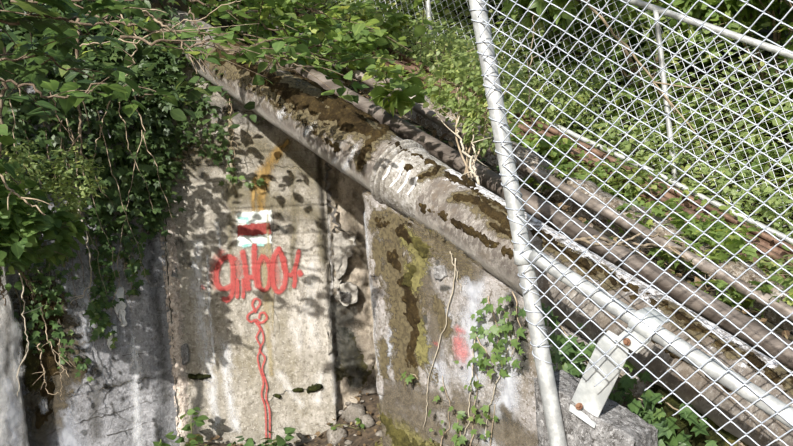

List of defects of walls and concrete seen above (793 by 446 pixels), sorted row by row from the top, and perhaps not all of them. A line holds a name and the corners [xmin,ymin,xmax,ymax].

corrosion [251,139,289,212]
leakage [382,166,418,195]
spalling [325,232,358,306]
spalling [367,258,376,277]
spalling [327,319,336,402]
spalling [376,373,385,396]
leakage [467,280,481,382]
leakage [493,343,513,420]